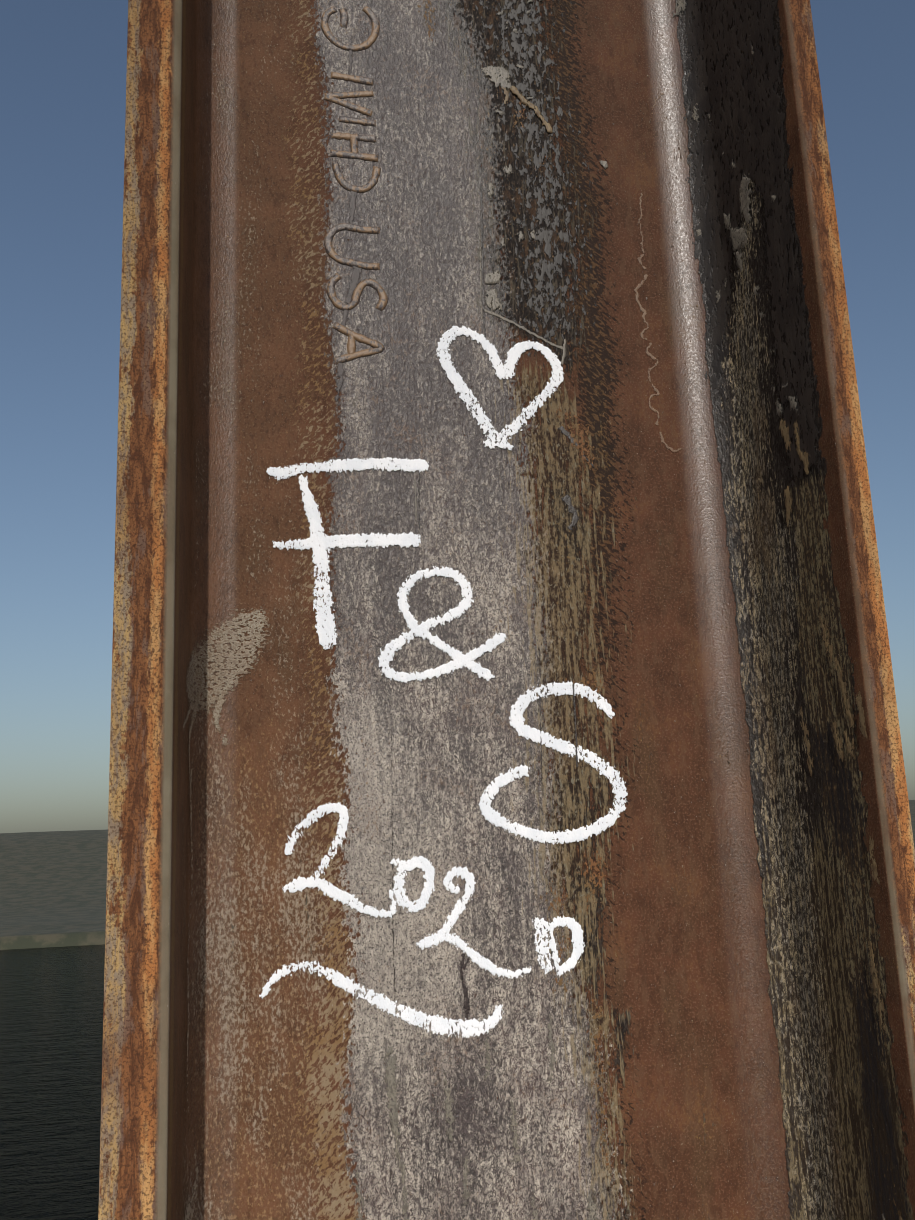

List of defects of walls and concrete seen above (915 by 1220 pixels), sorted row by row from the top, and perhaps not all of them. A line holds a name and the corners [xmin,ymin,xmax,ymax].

peeling [672,0,822,488]
corrosion [779,419,810,475]
corrosion [784,485,792,528]
corrosion [819,615,869,762]
corrosion [800,706,814,776]
corrosion [864,940,886,1031]